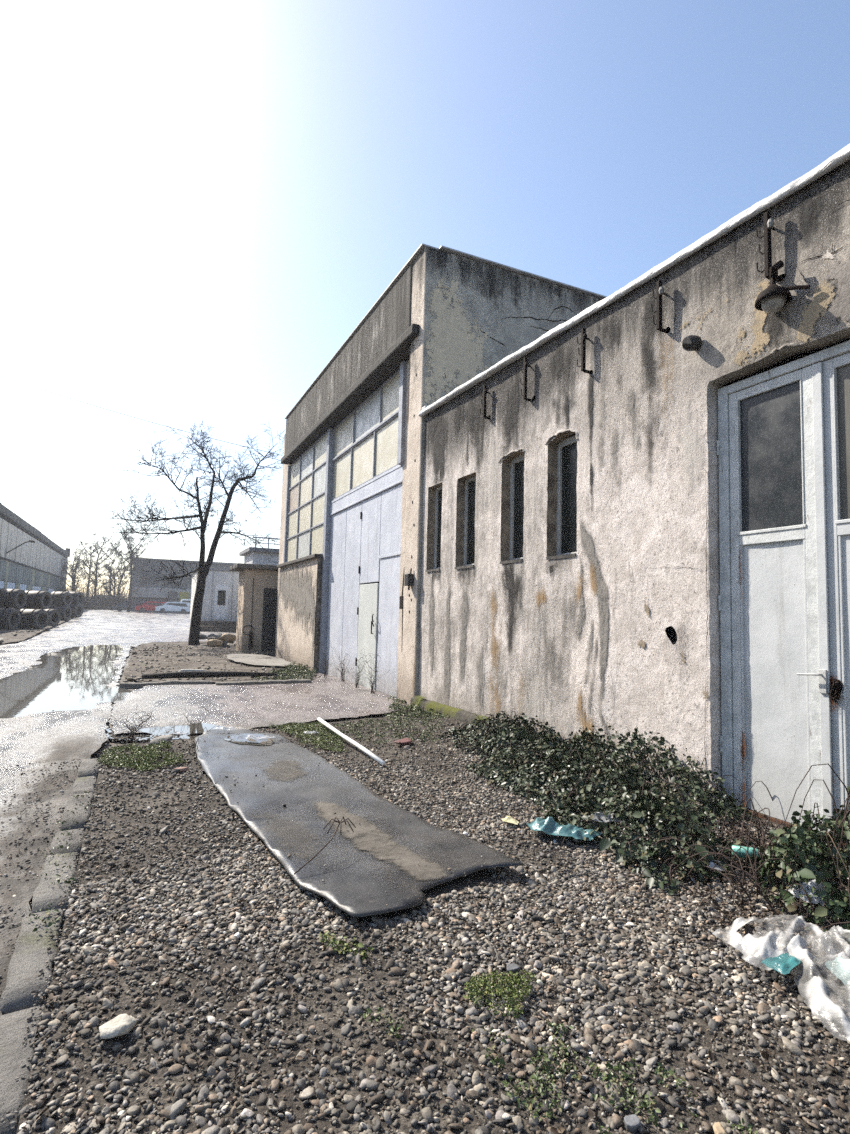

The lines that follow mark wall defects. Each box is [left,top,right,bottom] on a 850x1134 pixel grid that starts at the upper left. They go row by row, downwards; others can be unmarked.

water stain [434,249,447,268]
water stain [461,258,519,309]
crack [831,199,850,214]
peeling [424,268,494,416]
water stain [641,292,656,397]
water stain [427,367,525,496]
water stain [553,393,572,429]
water stain [588,374,656,509]
water stain [428,566,484,710]
water stain [502,563,521,652]
water stain [525,631,568,728]
water stain [564,521,615,746]